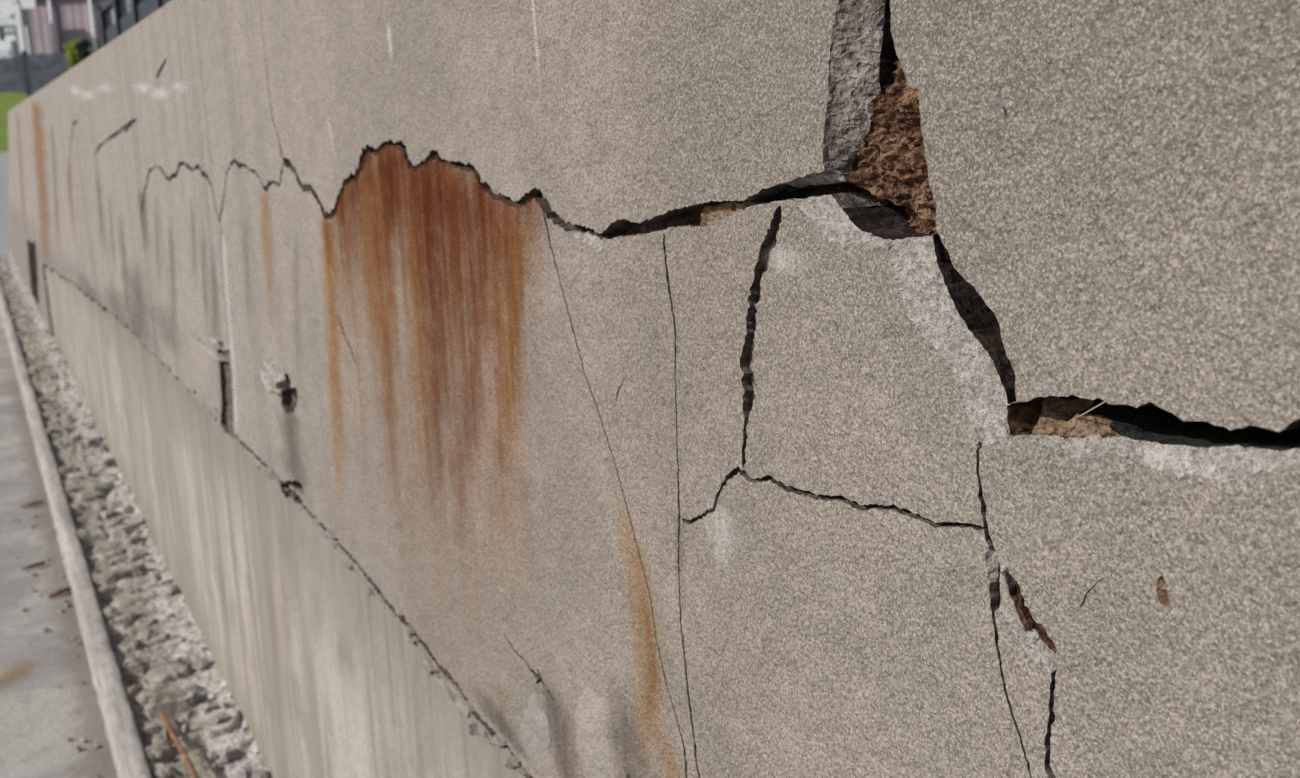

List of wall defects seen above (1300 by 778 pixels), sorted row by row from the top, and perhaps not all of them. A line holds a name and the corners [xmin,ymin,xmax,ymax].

crack [69,119,136,182]
crack [141,161,226,222]
spalling [777,0,1300,486]
crack [842,0,1300,451]
peeling [260,356,298,415]
crack [226,79,894,778]
crack [663,206,995,778]
spalling [983,543,1057,673]
crack [989,564,1057,778]
crack [1080,578,1105,608]